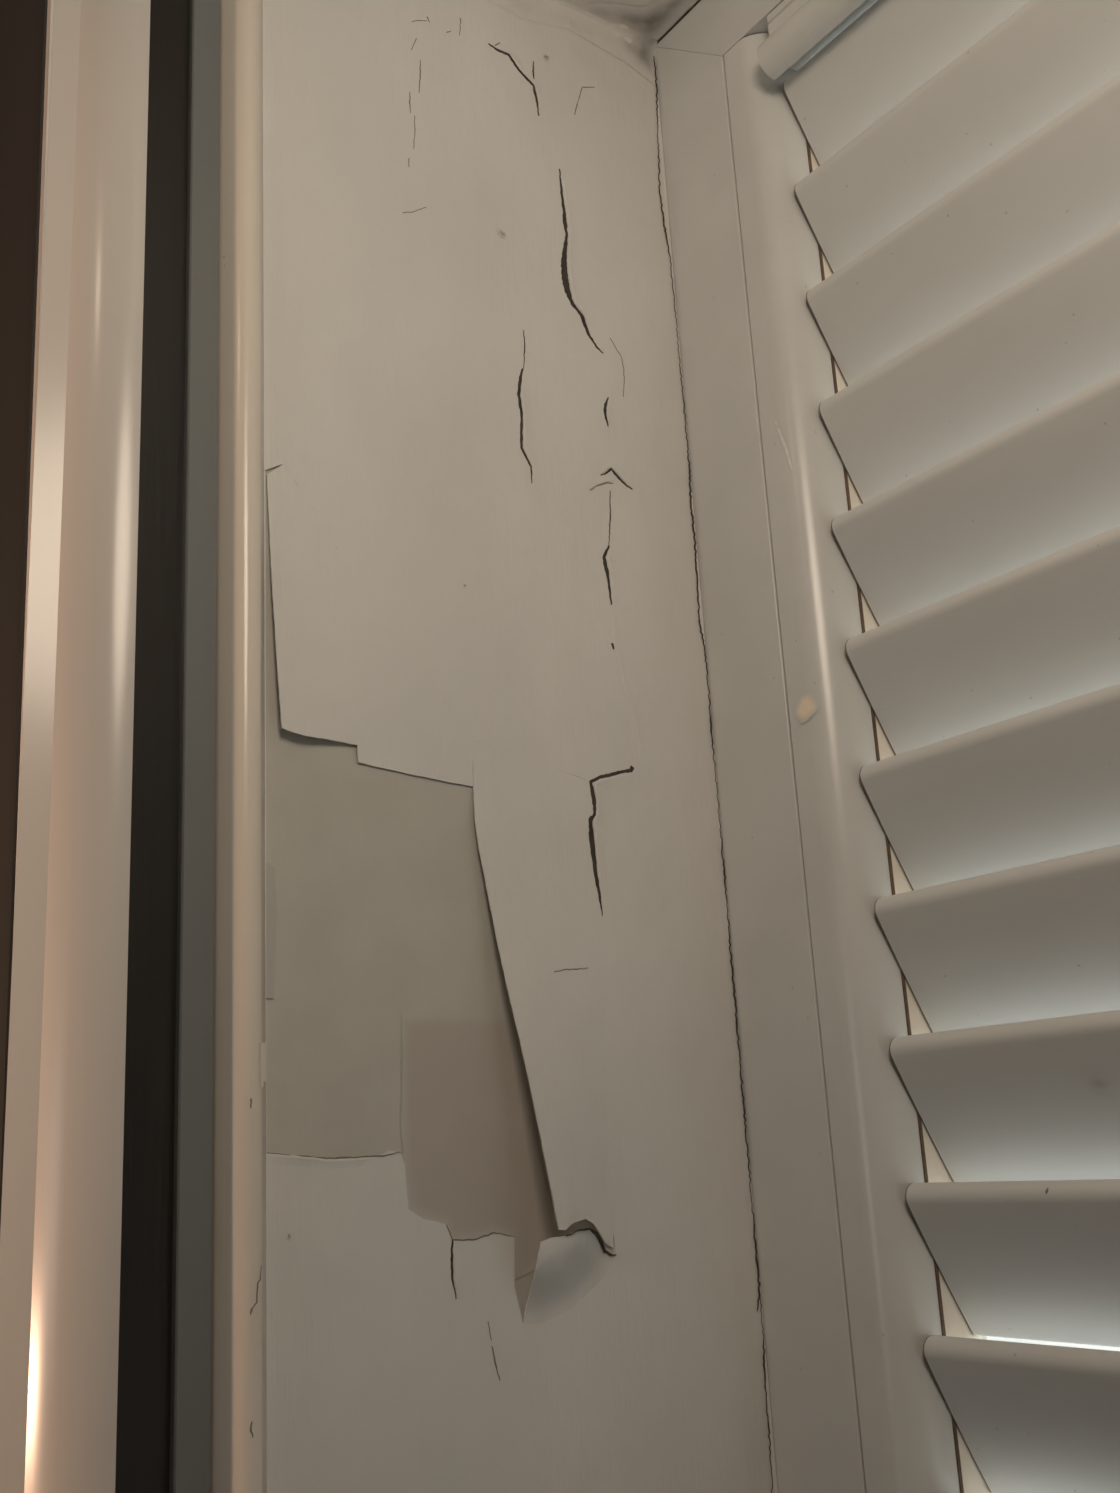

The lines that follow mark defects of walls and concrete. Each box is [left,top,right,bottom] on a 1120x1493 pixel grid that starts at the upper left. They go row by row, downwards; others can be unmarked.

peeling [265,464,616,1324]
crack [408,17,595,165]
crack [517,330,542,485]
crack [559,169,647,916]